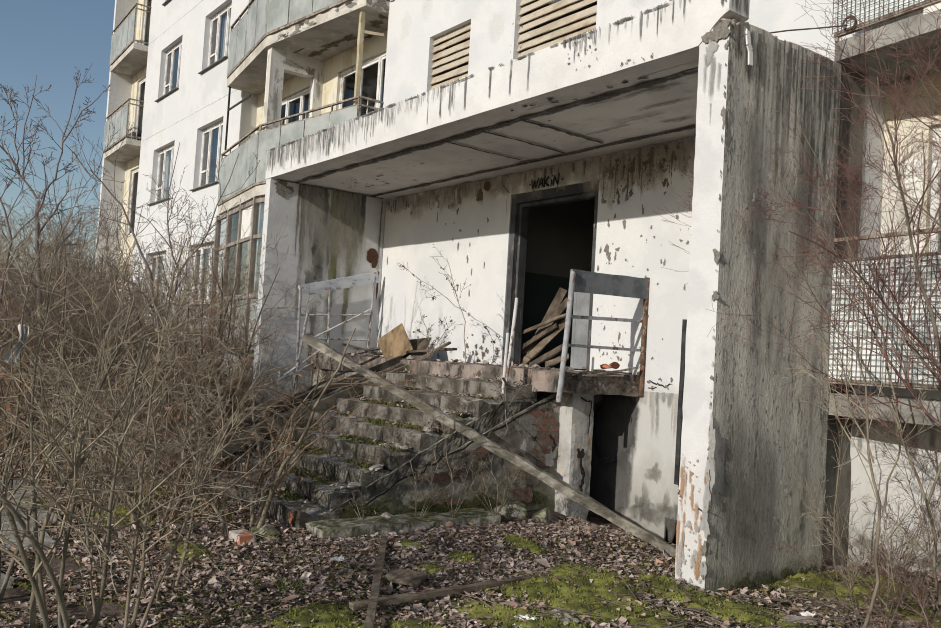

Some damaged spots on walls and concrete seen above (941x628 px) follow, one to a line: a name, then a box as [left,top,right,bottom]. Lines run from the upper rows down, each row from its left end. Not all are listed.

spalling [271,19,317,43]
water stain [283,14,388,99]
spalling [334,0,389,16]
water stain [563,20,618,69]
water stain [631,0,690,37]
water stain [721,0,845,262]
rust [367,201,383,299]
water stain [266,55,720,361]
peeling [597,243,633,271]
spalling [514,407,559,470]
water stain [590,395,677,538]
peeling [675,361,726,588]